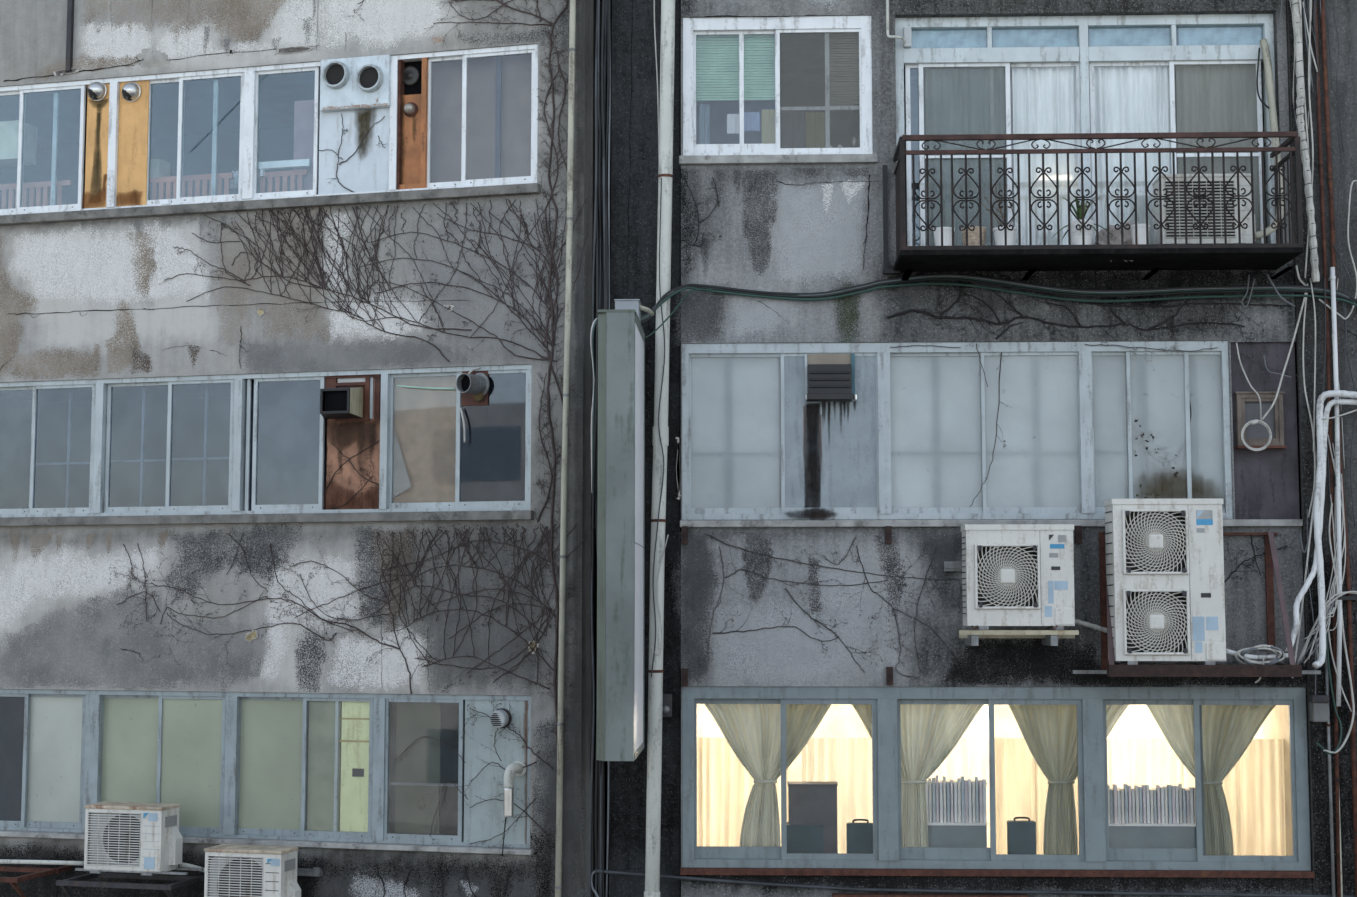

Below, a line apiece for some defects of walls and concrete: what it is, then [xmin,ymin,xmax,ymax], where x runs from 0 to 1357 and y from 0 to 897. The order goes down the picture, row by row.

damp [35,53,141,83]
damp [80,0,285,60]
damp [0,106,171,380]
damp [679,168,869,276]
damp [199,0,586,729]
damp [805,401,856,518]
damp [0,523,303,691]